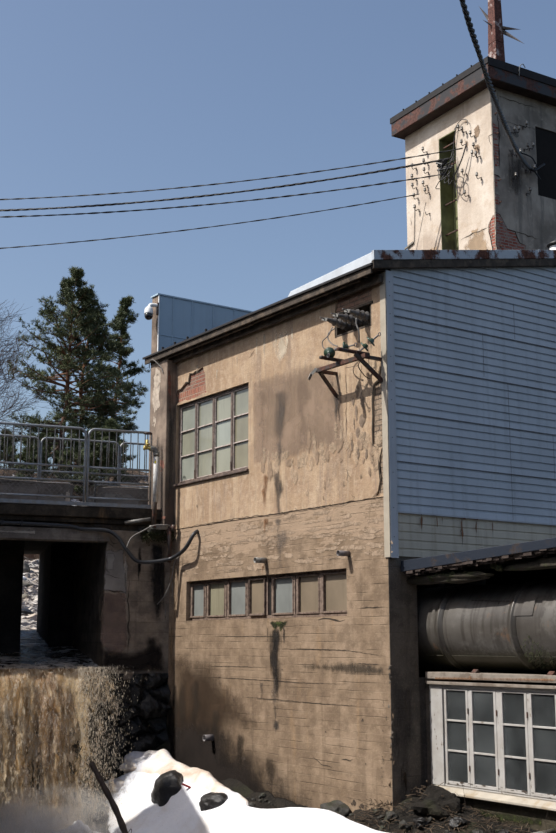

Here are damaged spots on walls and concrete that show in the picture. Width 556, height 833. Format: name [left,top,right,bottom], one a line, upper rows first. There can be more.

flaking render [488,123,526,250]
flaking render [152,360,214,427]
leakage [254,368,341,460]
peeling [170,381,393,576]
leakage [267,628,284,692]
leakage [166,664,295,804]